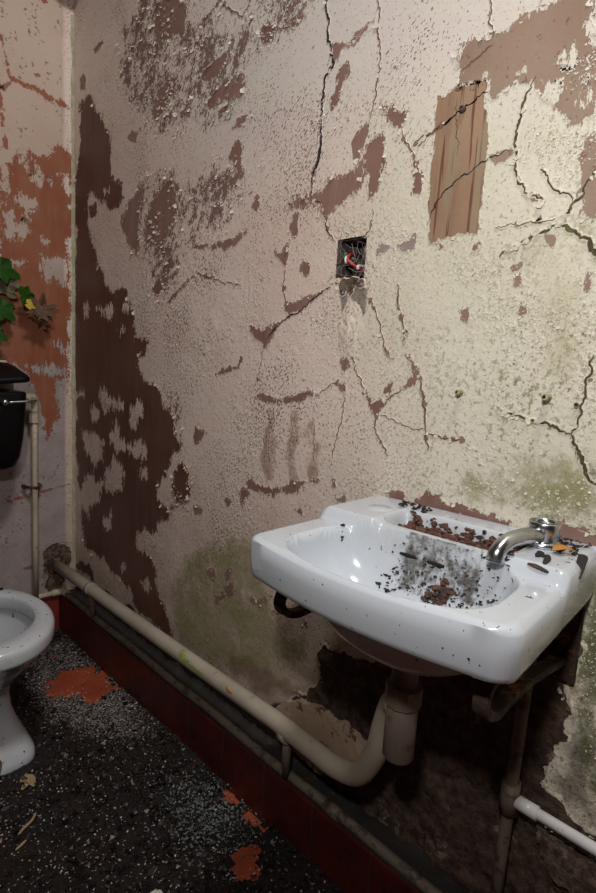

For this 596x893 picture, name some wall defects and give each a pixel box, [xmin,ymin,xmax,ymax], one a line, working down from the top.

crack [309,0,336,244]
peeling [274,15,419,266]
peeling [376,0,596,255]
crack [397,77,596,259]
peeling [0,0,324,638]
crack [268,353,465,462]
crack [368,283,409,361]
crack [495,353,596,495]
water stain [75,587,282,745]
flaking render [291,674,517,893]
flaking render [503,811,596,893]
flaking render [519,603,596,842]